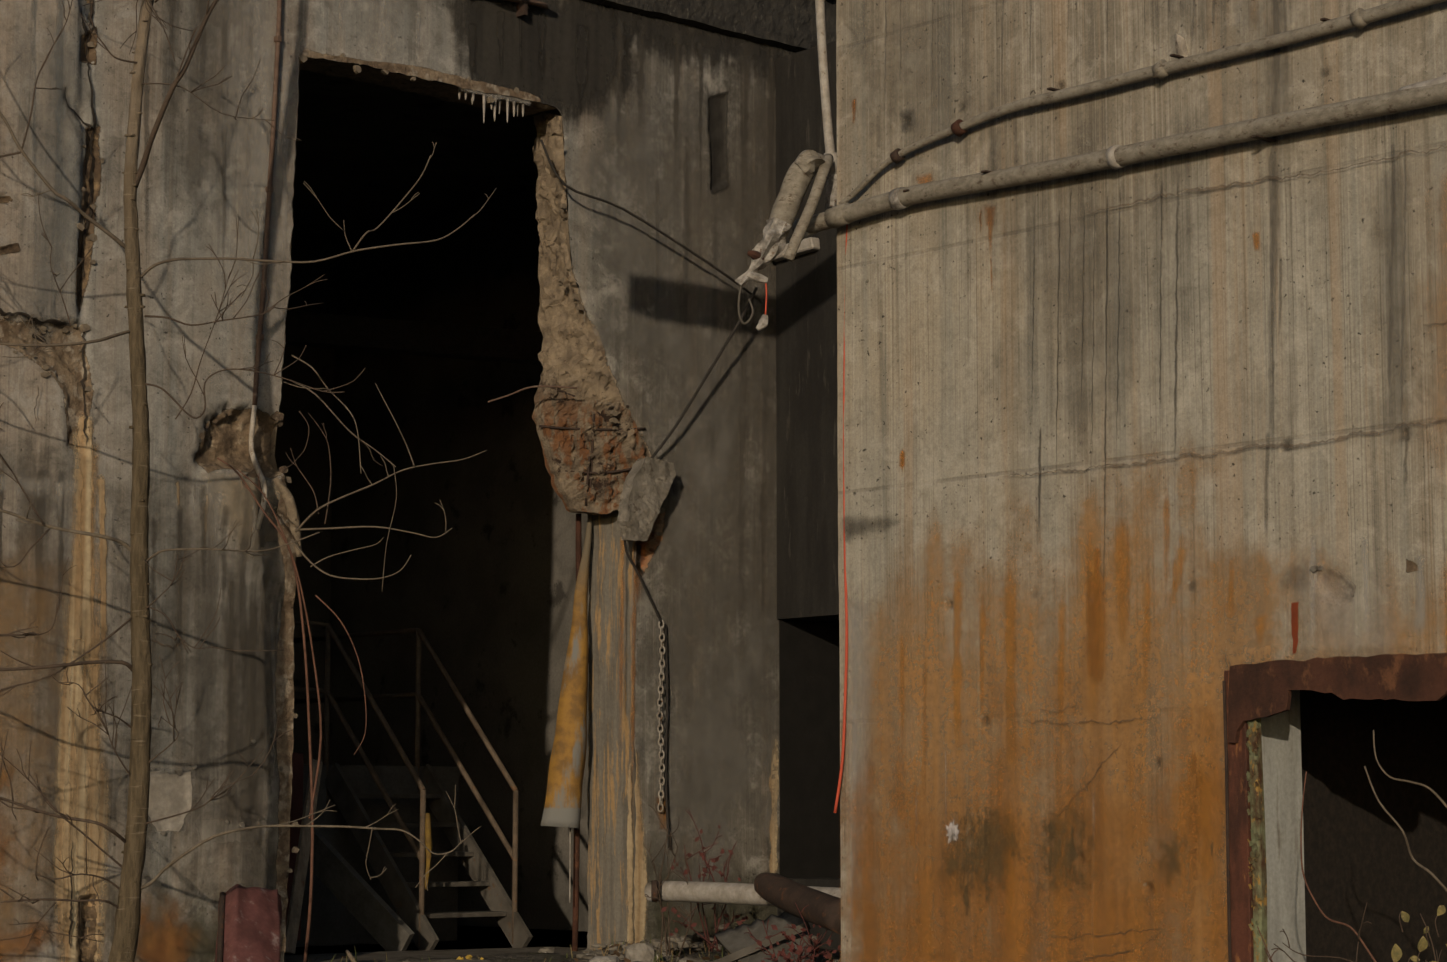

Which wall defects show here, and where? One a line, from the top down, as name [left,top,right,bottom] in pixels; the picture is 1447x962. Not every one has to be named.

spalling [80,27,97,65]
spalling [0,126,104,453]
spalling [298,48,651,457]
crack [1014,420,1447,476]
spalling [194,408,300,952]
rust [852,501,1353,962]